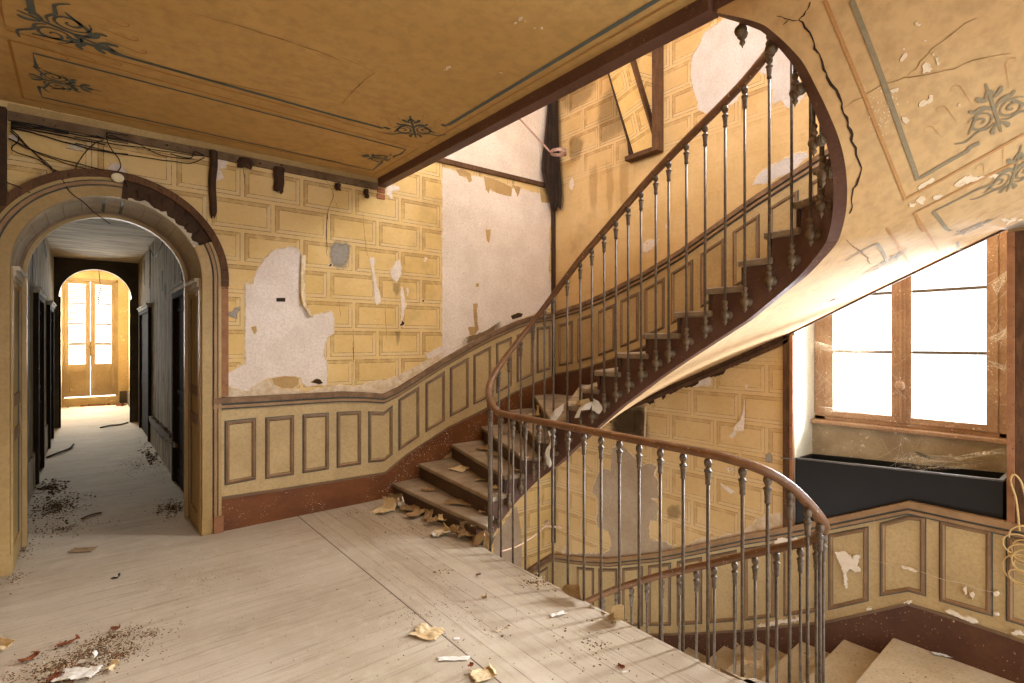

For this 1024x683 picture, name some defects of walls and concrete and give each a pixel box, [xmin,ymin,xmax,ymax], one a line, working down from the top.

peeling [690,18,807,114]
flaking render [922,53,940,74]
crack [777,2,1011,214]
flaking render [865,88,933,136]
peeling [752,151,809,185]
flaking render [909,178,944,207]
flaking render [953,174,998,187]
peeling [226,105,551,397]
peeling [835,551,861,589]
peeling [945,609,979,623]